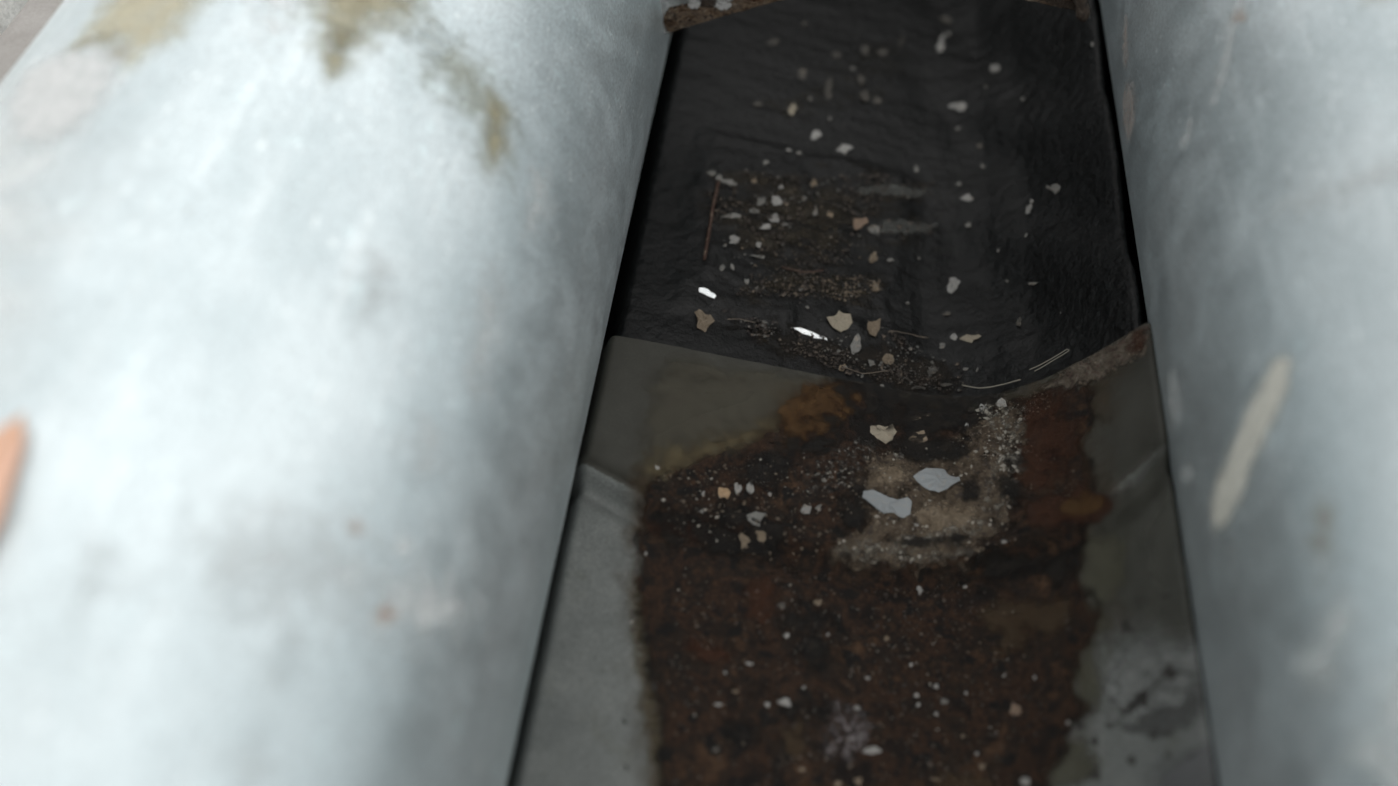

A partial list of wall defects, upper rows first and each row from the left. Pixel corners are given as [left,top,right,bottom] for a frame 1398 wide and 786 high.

corrosion [663,0,781,33]
corrosion [633,379,1110,786]